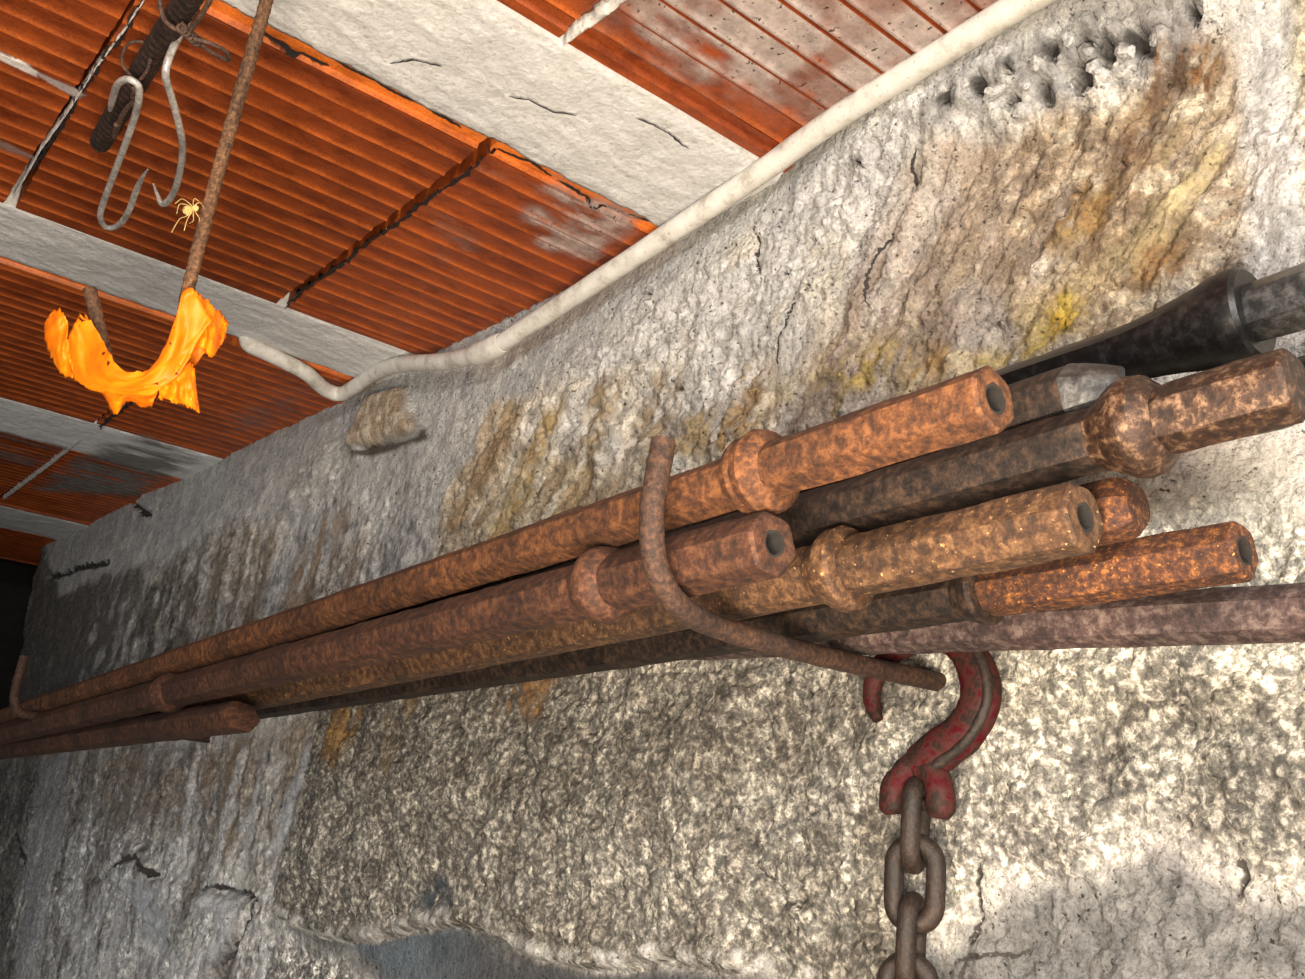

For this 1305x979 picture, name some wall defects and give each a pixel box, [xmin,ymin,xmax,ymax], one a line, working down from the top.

spalling [927,11,1177,120]
rust [1050,44,1216,260]
crack [862,149,918,309]
rust [1123,148,1221,282]
rust [673,374,767,454]
rust [836,344,890,406]
rust [1024,293,1080,354]
crack [113,853,161,878]